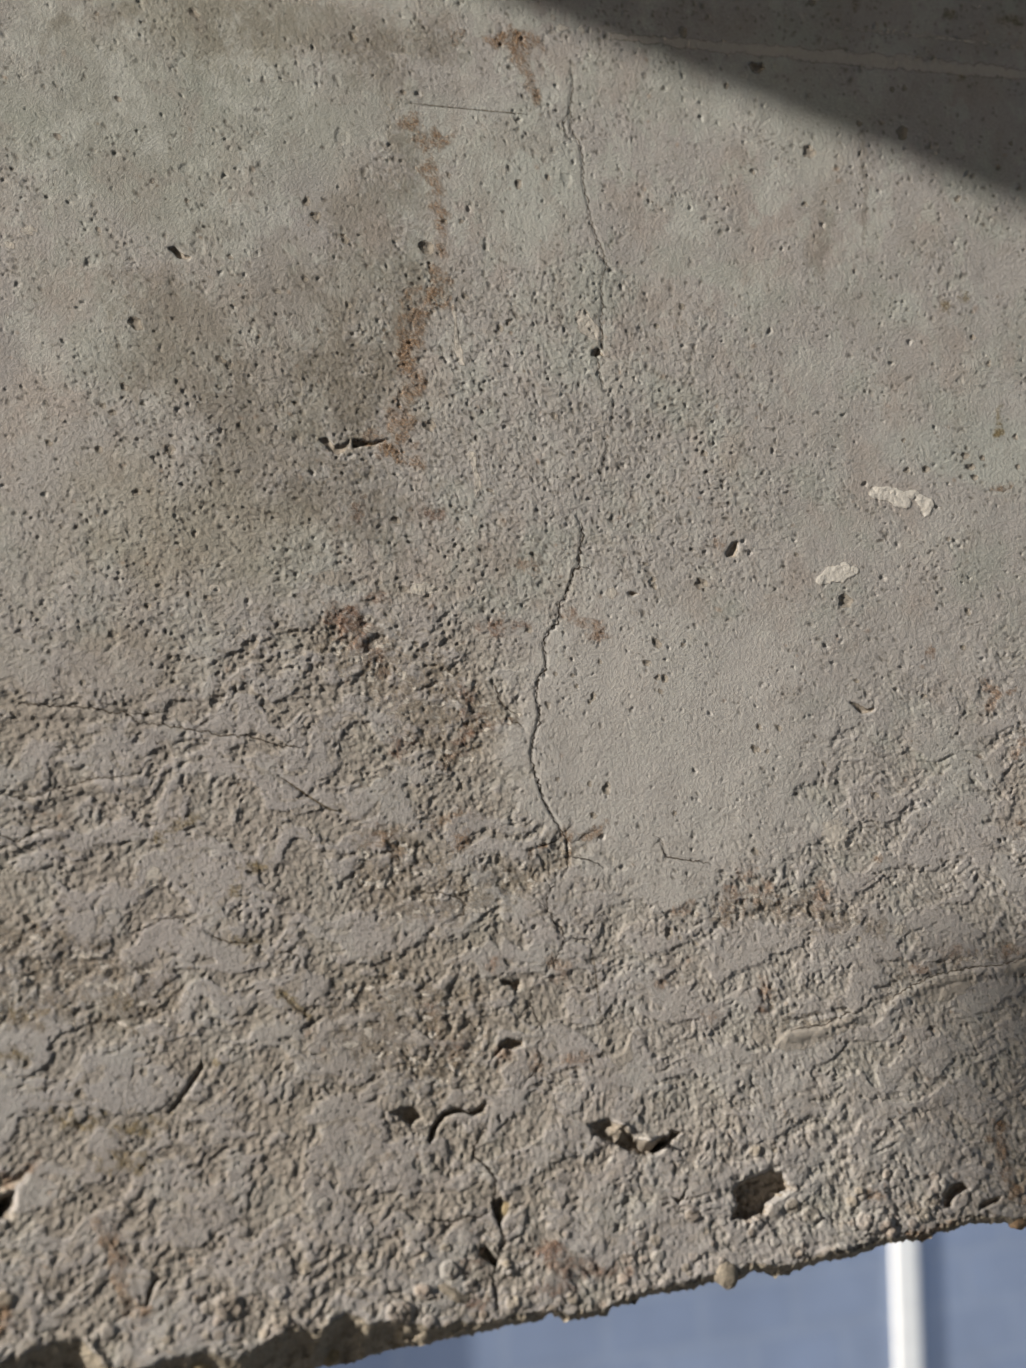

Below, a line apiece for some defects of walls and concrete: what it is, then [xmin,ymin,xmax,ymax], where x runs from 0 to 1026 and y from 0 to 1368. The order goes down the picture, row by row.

rust [364,117,452,468]
crack [563,72,614,478]
crack [489,520,602,1087]
spalling [0,1340,111,1368]
spalling [149,1216,1026,1368]